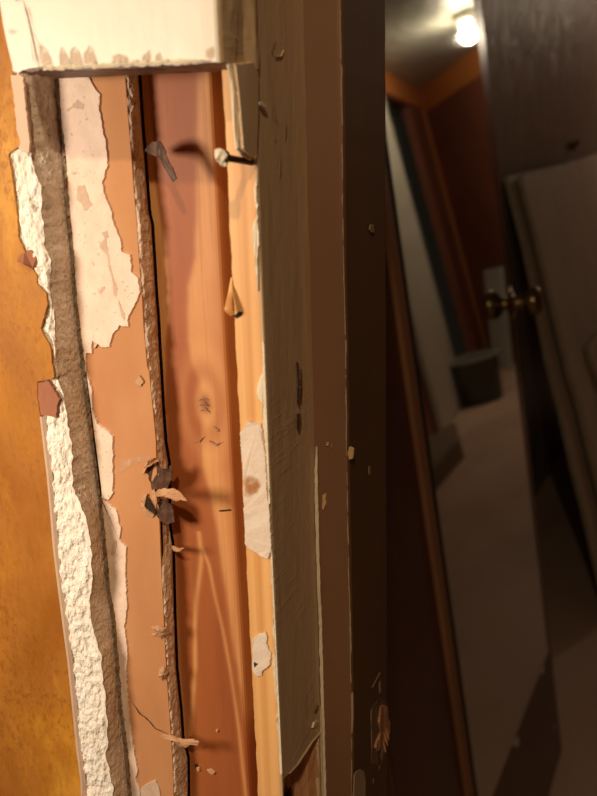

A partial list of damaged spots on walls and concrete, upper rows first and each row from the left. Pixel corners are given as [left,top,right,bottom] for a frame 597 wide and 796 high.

spalling [10,67,199,796]
peeling [257,340,271,504]
peeling [345,394,355,460]
peeling [348,557,374,796]